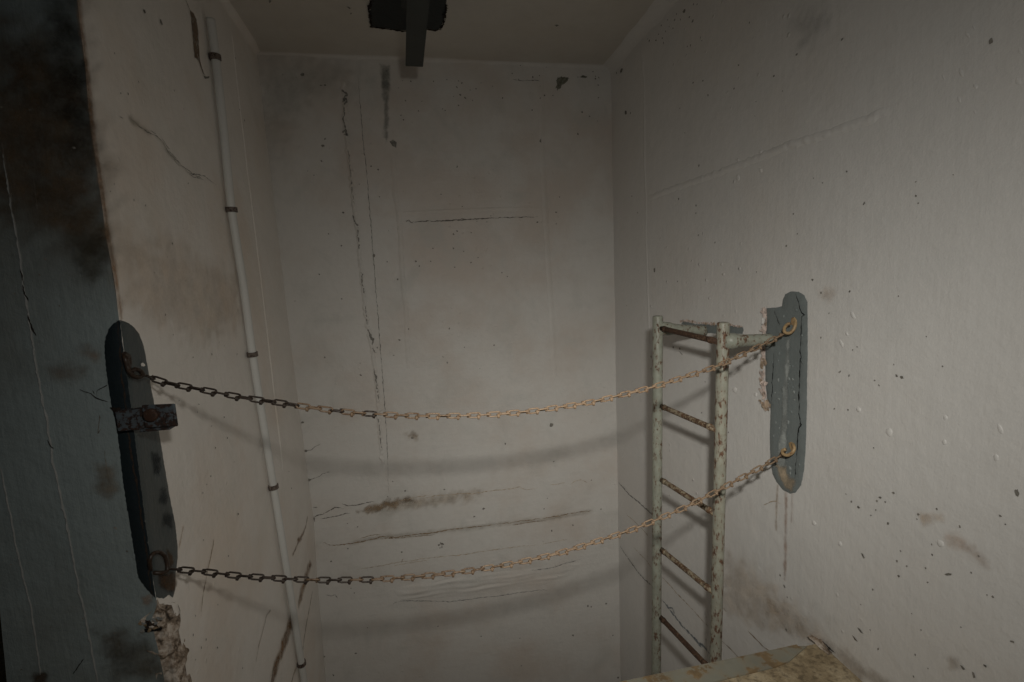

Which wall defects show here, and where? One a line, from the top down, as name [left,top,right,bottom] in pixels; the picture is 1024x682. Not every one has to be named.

crack [313,79,593,603]
leakage [365,498,412,513]
spalling [138,599,218,682]